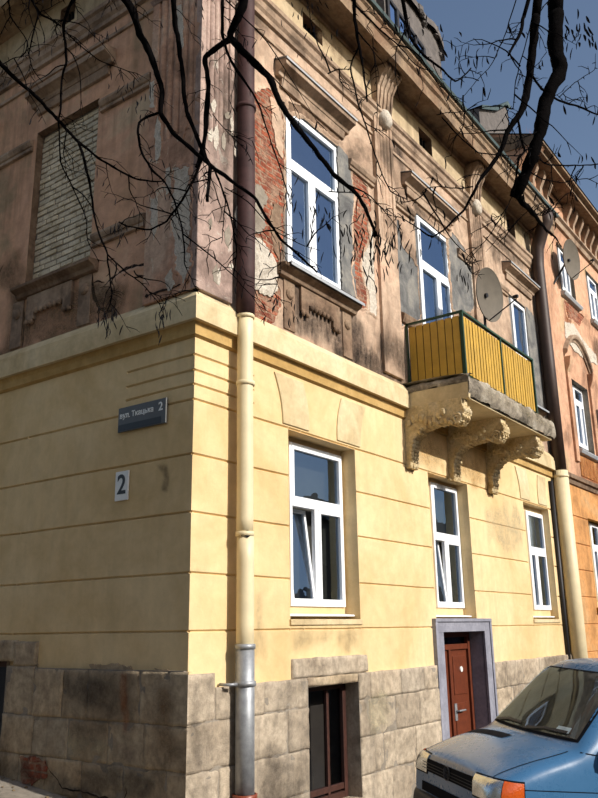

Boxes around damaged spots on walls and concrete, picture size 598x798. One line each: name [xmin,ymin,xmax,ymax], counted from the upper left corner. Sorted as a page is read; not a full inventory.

peeling [176,4,184,48]
peeling [149,81,162,164]
peeling [150,163,194,291]
flaking render [255,85,344,326]
flaking render [351,171,373,312]
spalling [19,755,48,786]
crack [48,768,127,798]